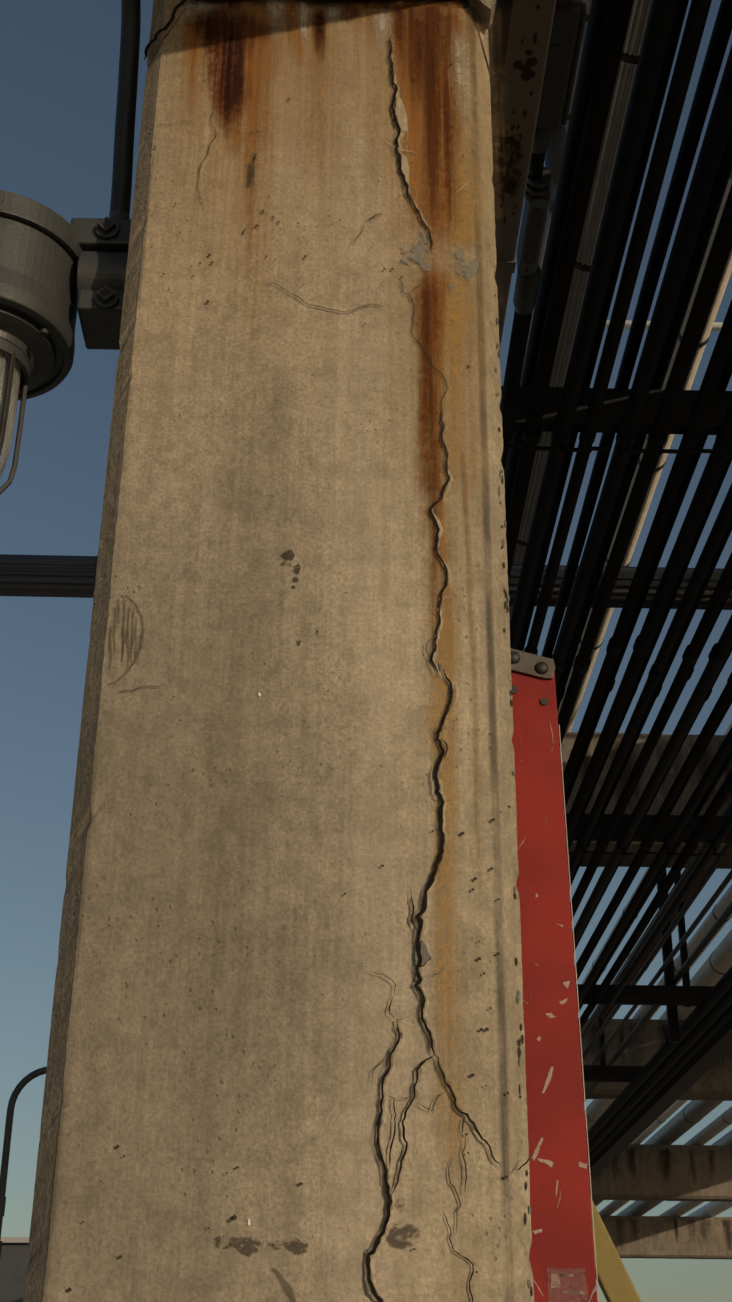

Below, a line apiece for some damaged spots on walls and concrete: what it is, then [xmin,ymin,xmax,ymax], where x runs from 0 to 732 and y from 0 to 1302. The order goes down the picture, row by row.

crack [144,0,186,60]
rust [183,3,478,247]
crack [355,38,437,255]
rust [492,33,538,229]
rust [411,267,474,1049]
crack [264,280,532,1302]